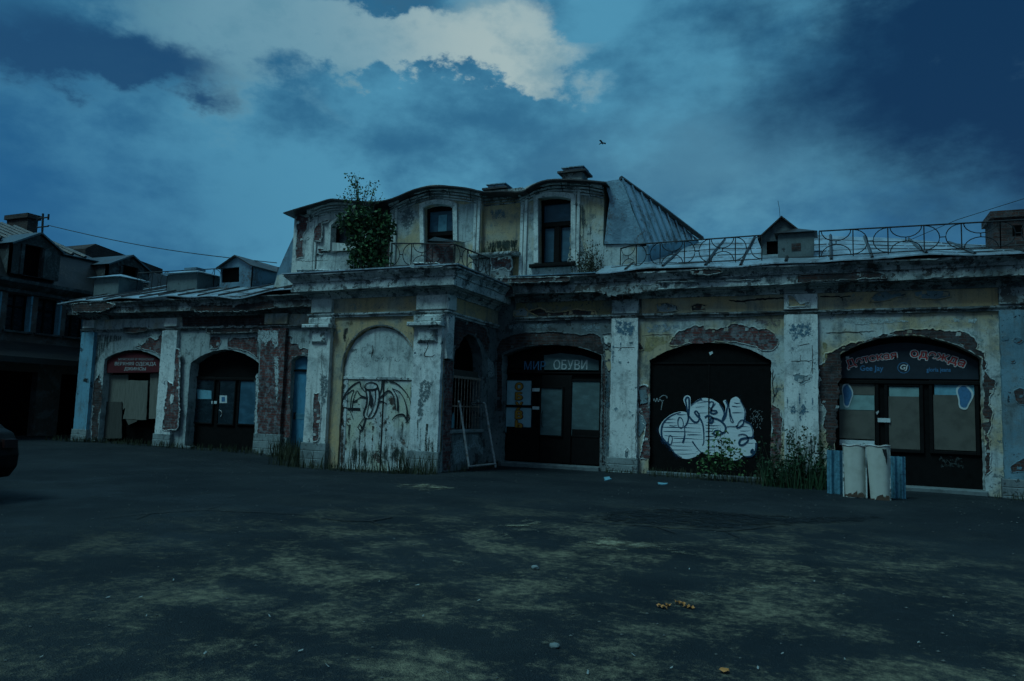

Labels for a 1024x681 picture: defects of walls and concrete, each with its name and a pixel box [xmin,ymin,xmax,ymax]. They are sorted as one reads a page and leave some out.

spalling [295,215,330,260]
spalling [137,333,162,356]
spalling [162,348,181,431]
spalling [182,305,308,439]
spalling [312,375,328,443]
spalling [668,302,997,475]